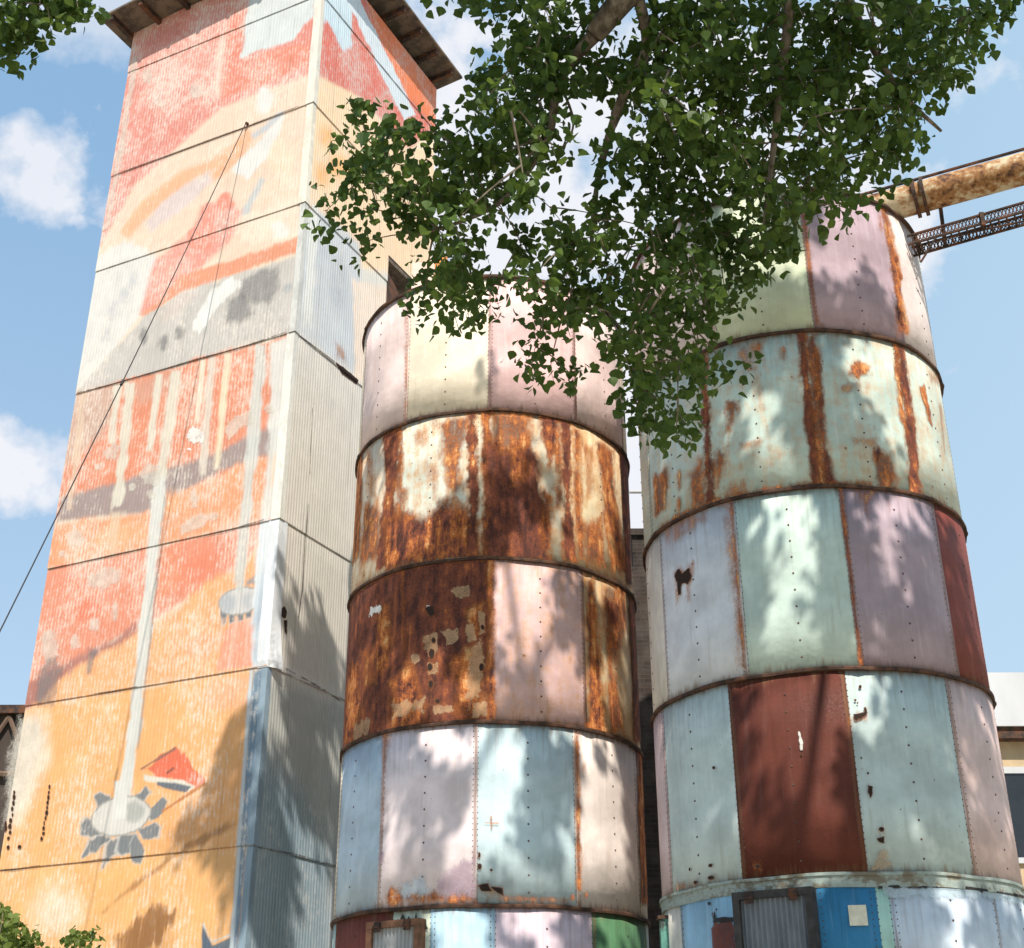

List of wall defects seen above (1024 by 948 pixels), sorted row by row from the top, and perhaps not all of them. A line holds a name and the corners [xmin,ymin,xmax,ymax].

rust [882,208,909,334]
rust [342,412,648,907]
rust [653,353,745,651]
rust [796,333,944,665]